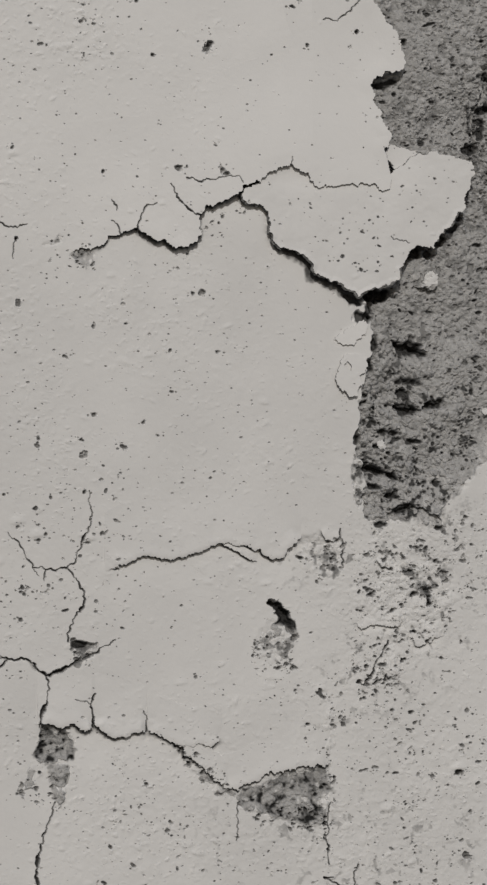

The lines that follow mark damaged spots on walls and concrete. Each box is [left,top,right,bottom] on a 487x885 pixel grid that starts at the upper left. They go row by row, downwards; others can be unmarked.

crack [0,220,29,260]
spalling [29,0,487,693]
crack [0,489,117,729]
crack [141,710,149,733]
spalling [0,612,342,828]
crack [33,800,57,885]
crack [234,800,242,842]